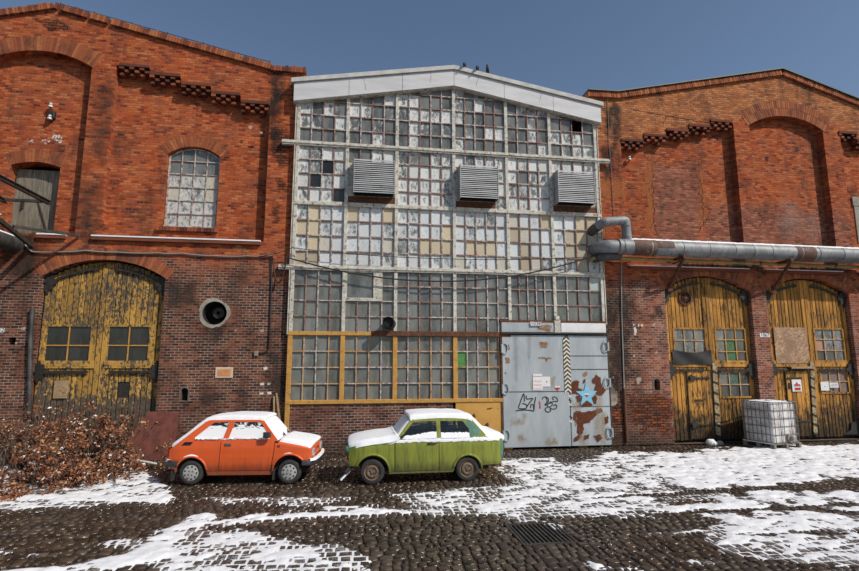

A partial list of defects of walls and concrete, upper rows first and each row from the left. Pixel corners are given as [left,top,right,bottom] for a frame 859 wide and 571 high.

water stain [269,71,281,115]
rust [571,372,609,442]